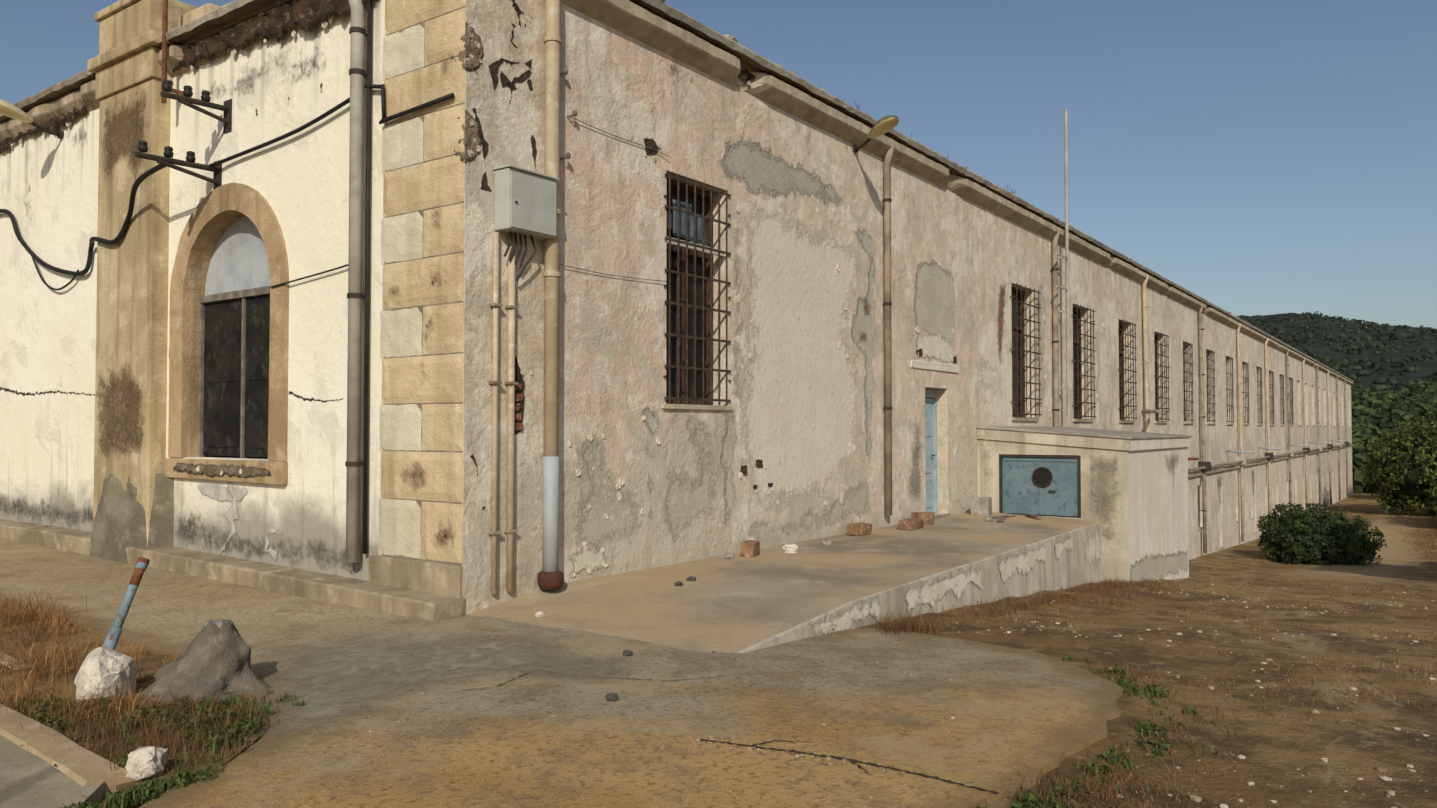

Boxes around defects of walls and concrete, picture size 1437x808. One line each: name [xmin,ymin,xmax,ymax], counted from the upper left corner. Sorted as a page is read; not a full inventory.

spalling [443,22,484,72]
leakage [104,96,145,175]
spalling [454,110,482,164]
peeling [914,259,957,363]
peeling [568,131,876,577]
crack [0,387,95,396]
leakage [99,366,142,456]
crack [288,391,344,403]
leakage [0,500,93,524]
peeling [807,597,881,636]